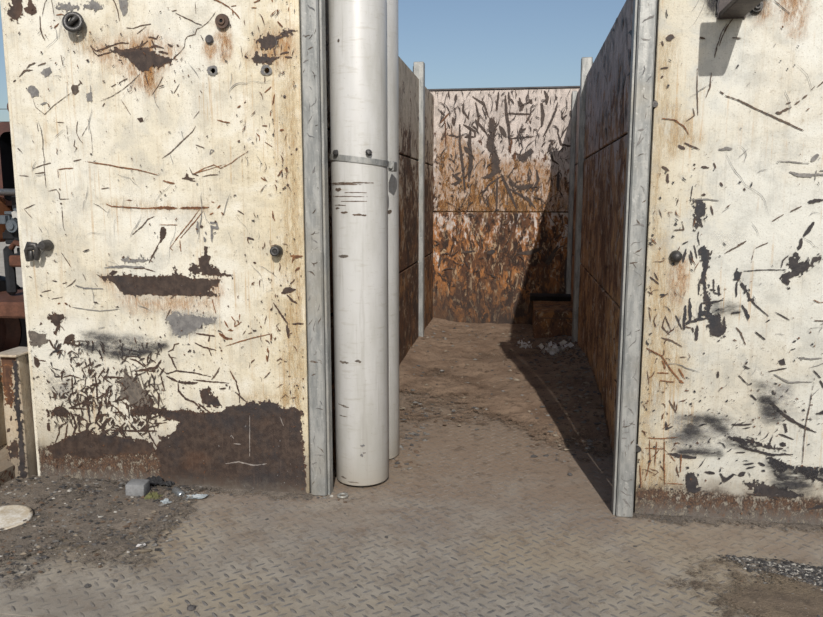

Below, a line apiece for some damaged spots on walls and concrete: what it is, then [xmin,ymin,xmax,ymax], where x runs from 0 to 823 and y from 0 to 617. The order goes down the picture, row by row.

peeling [7,0,37,23]
spalling [90,35,180,86]
corrosion [439,136,569,210]
peeling [98,227,233,299]
peeling [675,186,822,341]
peeling [166,311,217,338]
peeling [6,357,27,478]
corrosion [38,438,177,483]
peeling [683,423,823,499]
corrosion [635,474,823,526]